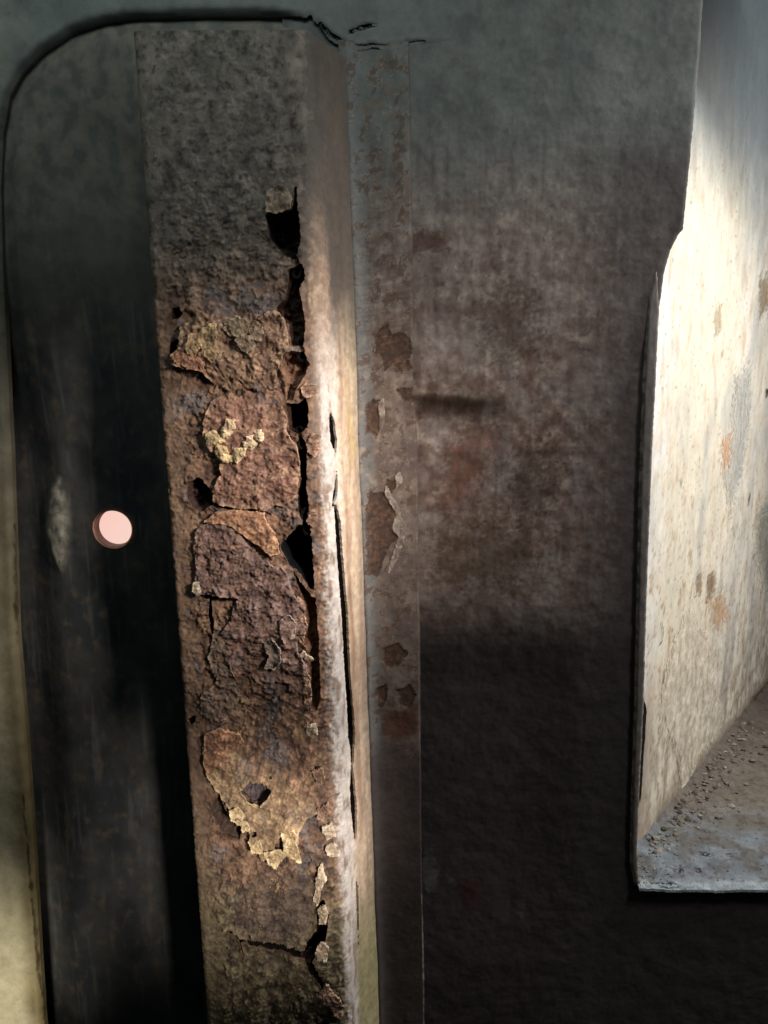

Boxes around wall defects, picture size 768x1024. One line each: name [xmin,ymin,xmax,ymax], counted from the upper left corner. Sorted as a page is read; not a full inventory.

crack [318,22,426,51]
corrosion [265,184,292,214]
peeling [174,315,266,374]
crack [295,415,335,449]
corrosion [204,509,280,556]
peeling [365,472,407,577]
crack [301,481,355,838]
spalling [243,782,271,801]
spalling [213,796,302,870]
corrosion [313,801,341,925]
crack [220,927,324,989]
corrosion [314,942,329,963]